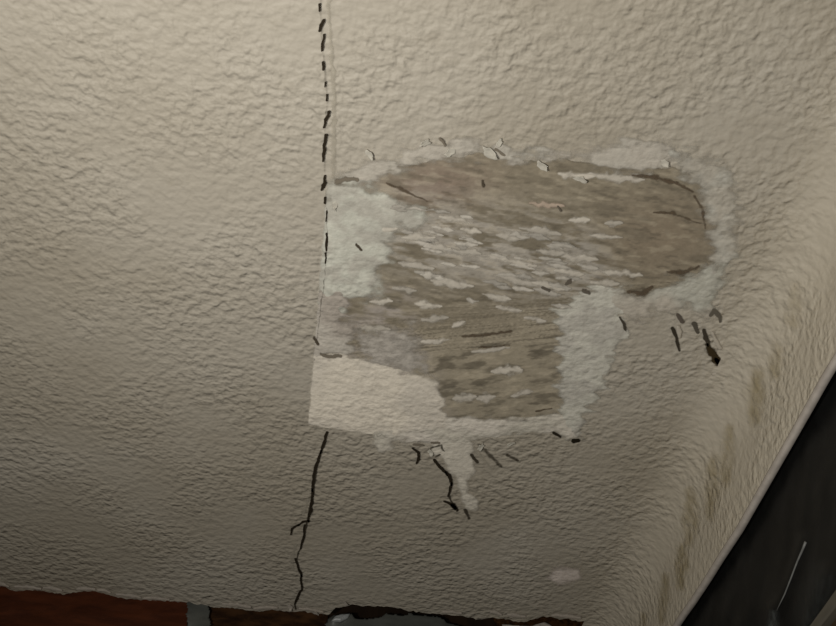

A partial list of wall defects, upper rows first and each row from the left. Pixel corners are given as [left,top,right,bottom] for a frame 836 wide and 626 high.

crack [318,0,336,264]
flaking render [308,138,743,511]
crack [412,445,470,520]
crack [470,444,518,469]
crack [290,431,328,610]
flaking render [0,581,62,592]
flaking render [76,586,170,601]
flaking render [222,602,324,616]